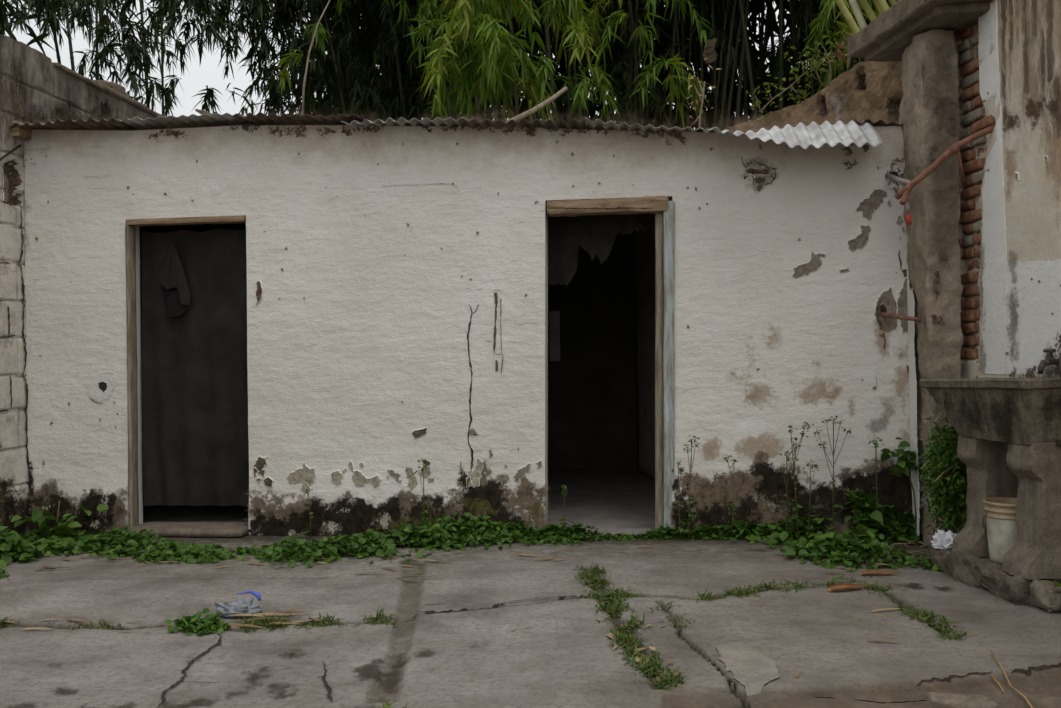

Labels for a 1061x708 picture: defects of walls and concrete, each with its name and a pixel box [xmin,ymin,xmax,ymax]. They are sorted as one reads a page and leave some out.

water stain [1001,0,1061,182]
spalling [1,160,24,207]
spalling [741,156,776,192]
peeling [847,166,906,253]
peeling [791,251,826,279]
water stain [1007,295,1061,378]
crack [460,305,480,493]
water stain [0,460,131,536]
peeling [253,456,317,495]
peeling [331,459,434,491]
water stain [246,462,548,536]
water stain [670,451,935,538]